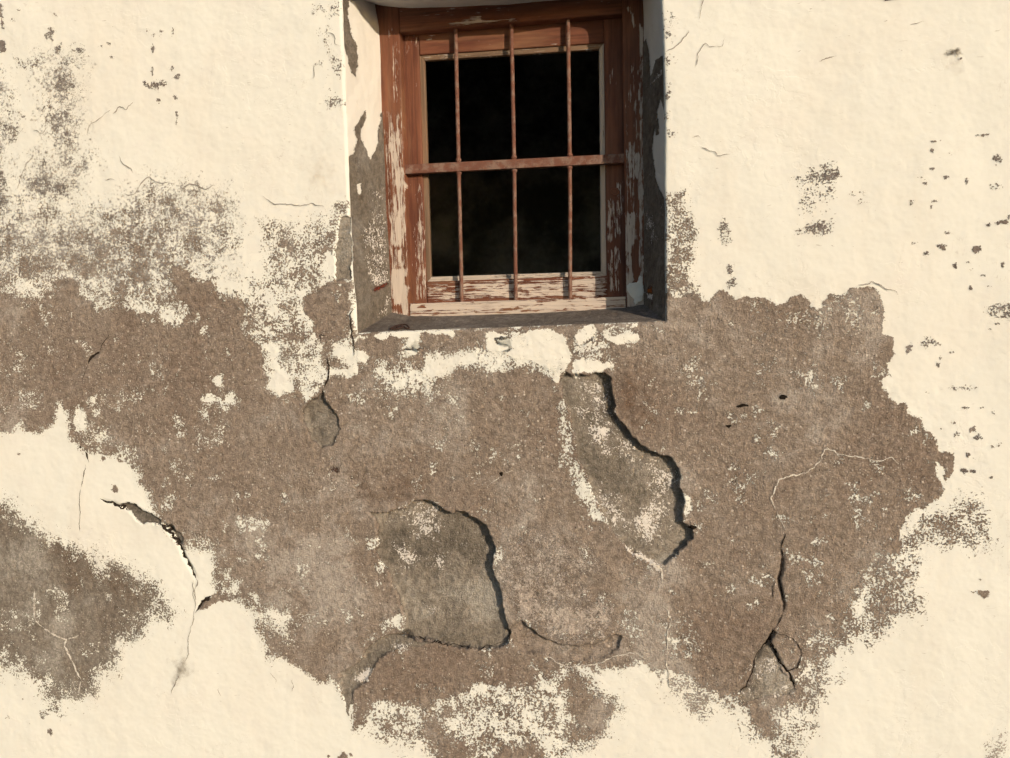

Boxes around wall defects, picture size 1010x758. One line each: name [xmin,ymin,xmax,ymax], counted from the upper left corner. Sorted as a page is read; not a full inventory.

peeling [0,90,25,154]
peeling [42,48,89,150]
peeling [143,66,180,104]
peeling [312,0,358,109]
peeling [0,167,14,219]
peeling [791,161,842,236]
crack [81,333,111,382]
peeling [906,336,954,367]
crack [79,453,127,530]
crack [741,447,899,690]
peeling [0,495,185,735]
crack [161,524,211,693]